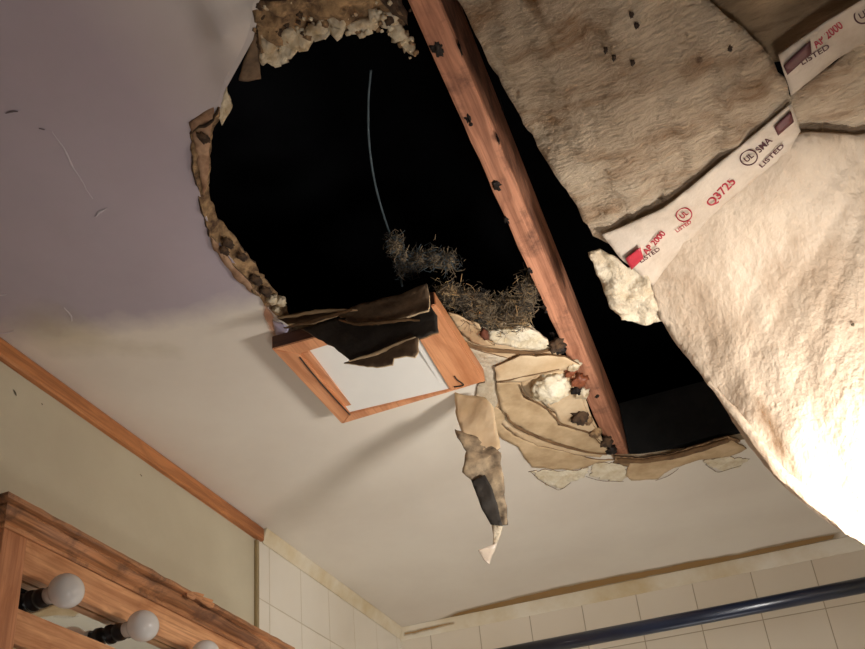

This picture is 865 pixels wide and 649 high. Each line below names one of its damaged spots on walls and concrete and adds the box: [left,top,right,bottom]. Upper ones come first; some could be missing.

spalling [239,0,419,82]
spalling [189,87,289,335]
spalling [529,435,749,490]